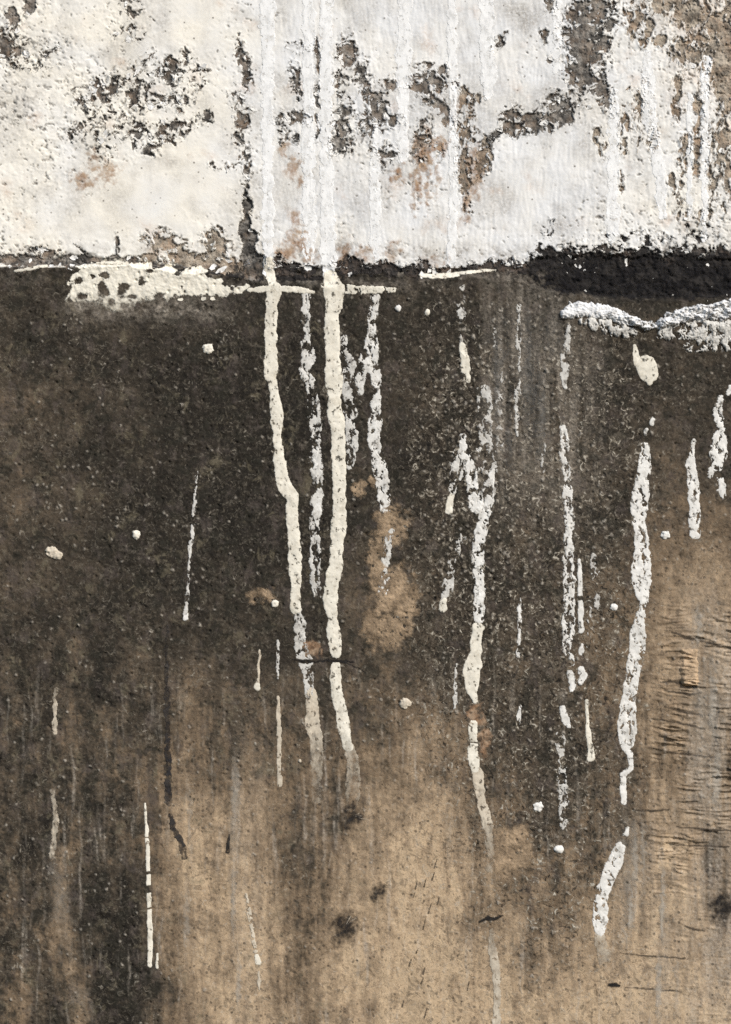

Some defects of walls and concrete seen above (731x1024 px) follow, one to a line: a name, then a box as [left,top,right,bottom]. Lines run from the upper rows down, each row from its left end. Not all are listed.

peeling [0,0,62,76]
peeling [64,0,214,163]
peeling [0,34,319,311]
peeling [276,0,731,279]
leakage [0,251,731,1024]